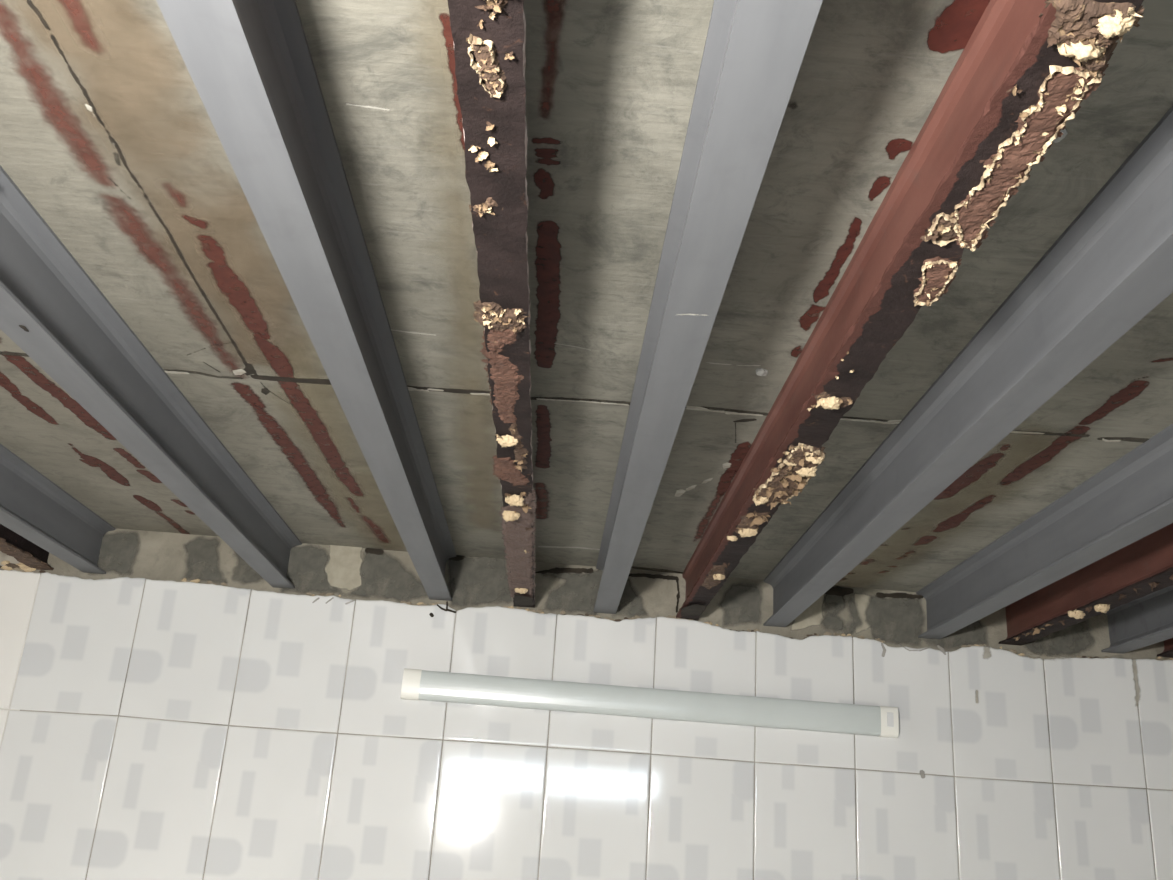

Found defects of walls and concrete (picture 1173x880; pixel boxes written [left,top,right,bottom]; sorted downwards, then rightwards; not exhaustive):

peeling [983,7,1143,180]
crack [27,0,331,406]
peeling [932,193,1010,248]
crack [0,350,29,358]
crack [407,385,490,394]
crack [530,397,630,405]
crack [685,406,768,443]
peeling [808,395,902,424]
crack [1013,430,1149,443]
peeling [727,444,824,541]
spalling [503,588,544,614]
peeling [961,575,1173,659]